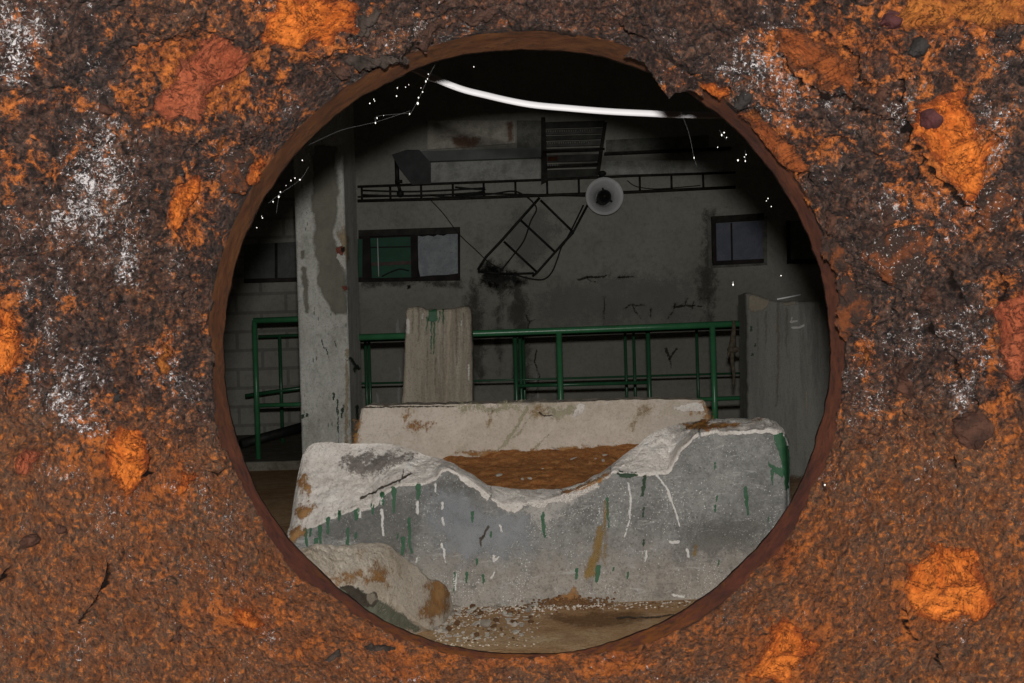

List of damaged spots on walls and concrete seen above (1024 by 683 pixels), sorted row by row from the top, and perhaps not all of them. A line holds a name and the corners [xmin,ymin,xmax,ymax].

rust [259,0,360,50]
rust [895,0,1024,32]
rust [150,33,251,124]
rust [910,89,997,205]
peeling [311,145,349,314]
leakage [363,279,530,412]
rust [104,426,150,495]
crack [360,469,411,499]
spalling [288,402,790,538]
crack [78,562,111,624]
rust [903,541,997,623]
rust [745,616,822,683]